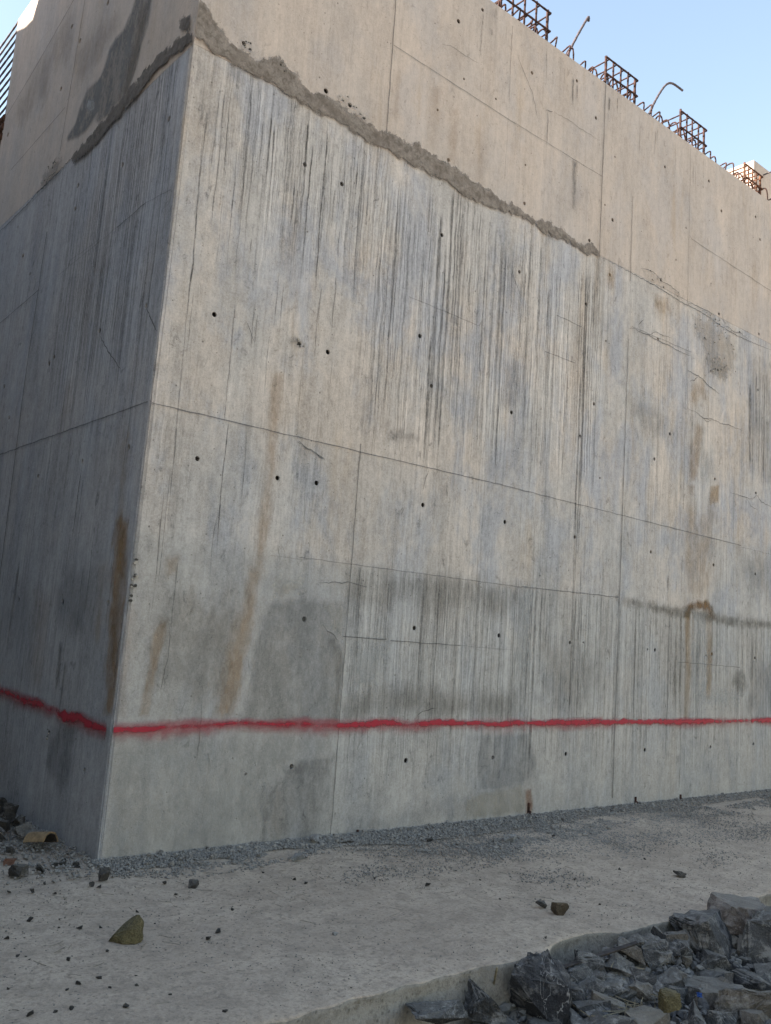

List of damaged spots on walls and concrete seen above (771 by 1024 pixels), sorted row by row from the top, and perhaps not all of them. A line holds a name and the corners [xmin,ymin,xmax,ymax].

leakage [68,0,151,140]
crack [604,258,768,349]
corrosion [685,601,712,617]